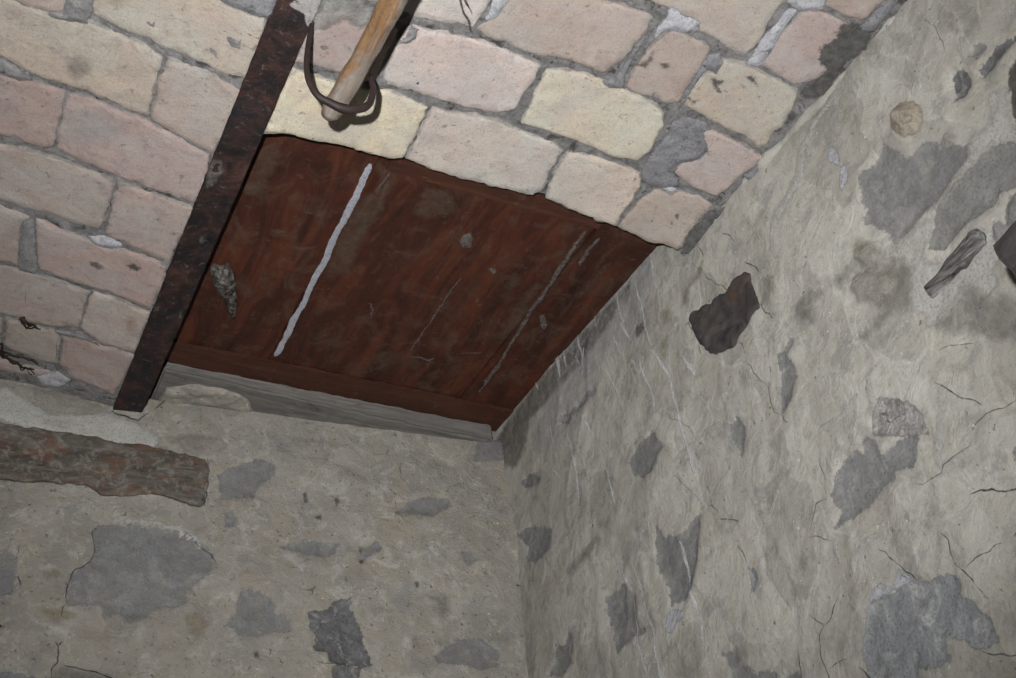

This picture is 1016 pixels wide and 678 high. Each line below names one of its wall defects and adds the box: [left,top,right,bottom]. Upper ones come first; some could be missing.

crack [971,487,1016,495]
crack [798,597,838,676]